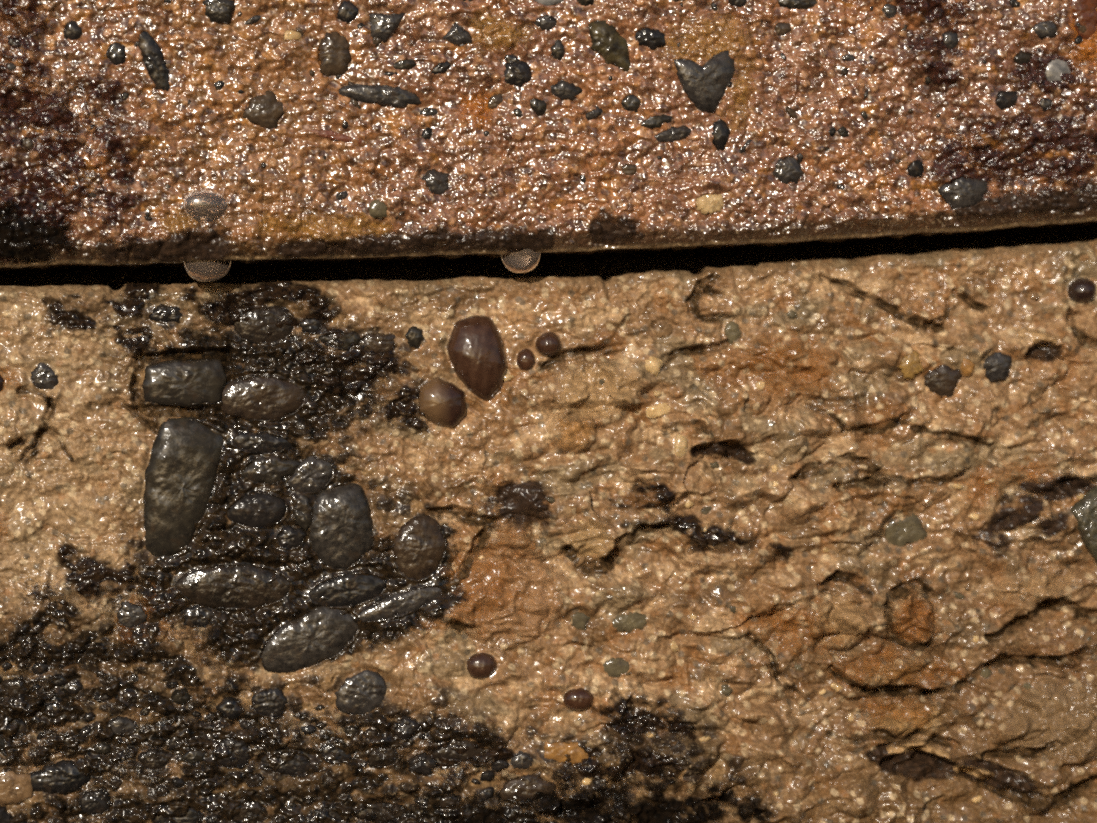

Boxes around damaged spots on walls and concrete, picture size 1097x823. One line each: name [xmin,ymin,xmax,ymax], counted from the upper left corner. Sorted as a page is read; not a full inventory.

damp [0,0,149,263]
crack [663,274,730,367]
crack [830,278,985,333]
crack [1068,307,1090,347]
crack [794,413,988,489]
damp [0,281,774,823]
damp [769,543,792,560]
crack [744,636,797,692]
crack [820,571,943,651]
crack [828,598,1097,697]
crack [827,730,951,747]
crack [970,743,1097,811]